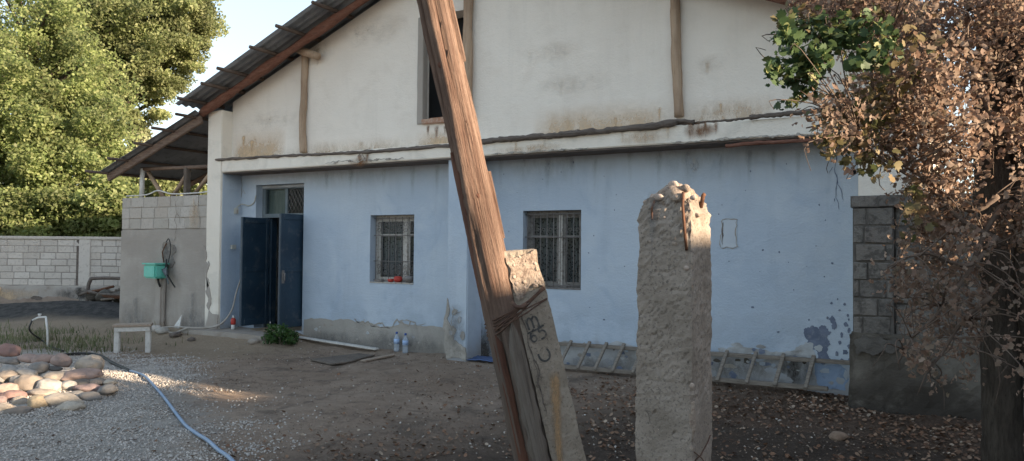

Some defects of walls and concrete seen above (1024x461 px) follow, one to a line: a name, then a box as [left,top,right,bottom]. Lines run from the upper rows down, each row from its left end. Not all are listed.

leakage [549,109,660,133]
flaking render [303,298,467,361]
flaking render [711,298,851,392]